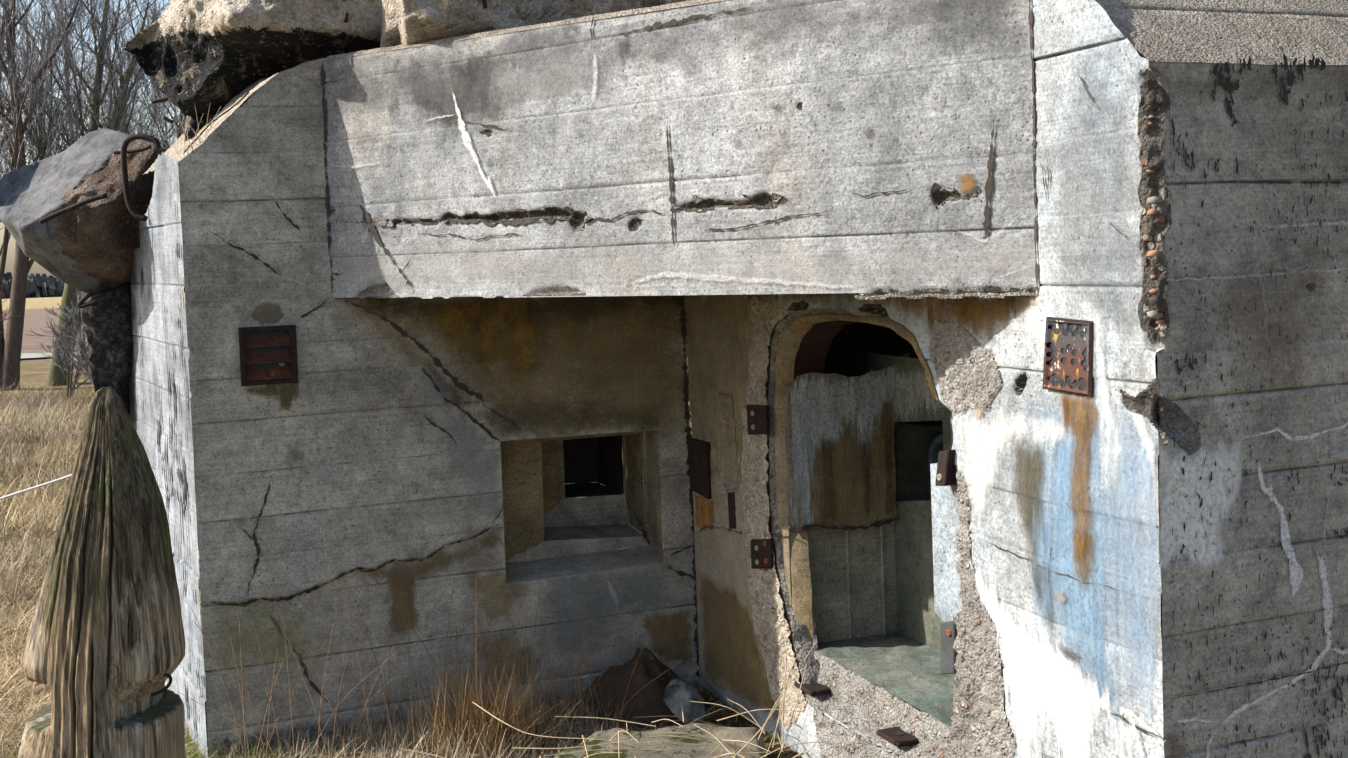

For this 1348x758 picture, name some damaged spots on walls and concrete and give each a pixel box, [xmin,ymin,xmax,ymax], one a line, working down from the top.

spalling [113,133,162,222]
crack [417,210,664,241]
spalling [1137,75,1172,344]
water stain [1212,76,1238,127]
crack [212,476,505,703]
crack [300,298,522,445]
spalling [740,295,1028,758]
water stain [960,315,1181,693]
rust [1061,394,1097,583]
spalling [1120,378,1201,456]
water stain [1179,551,1348,758]
water stain [1258,464,1303,597]